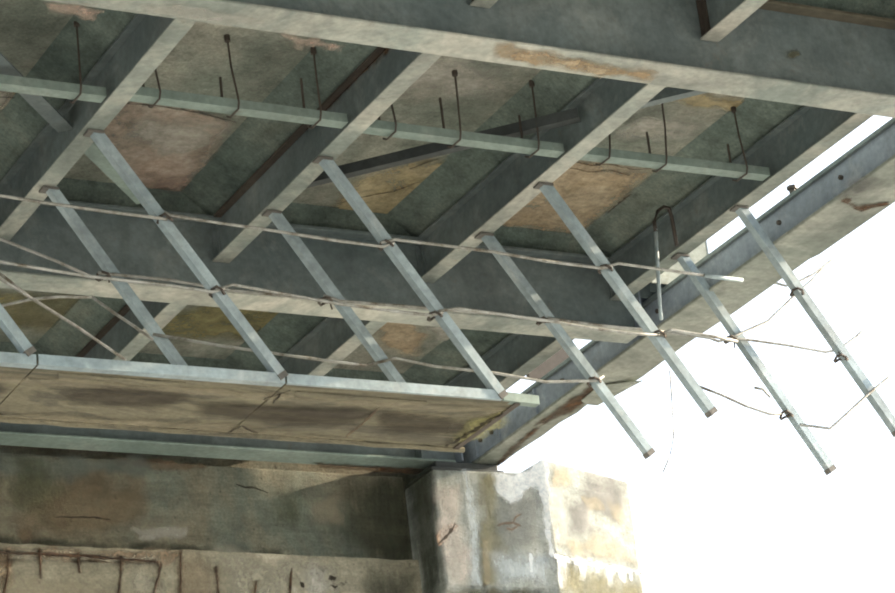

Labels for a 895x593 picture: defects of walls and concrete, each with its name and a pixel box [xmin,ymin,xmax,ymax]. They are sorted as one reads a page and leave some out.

corrosion [842,198,889,212]
leakage [71,389,183,407]
corrosion [498,387,594,465]
leakage [441,460,641,593]
spalling [0,547,182,593]
spalling [240,564,337,593]